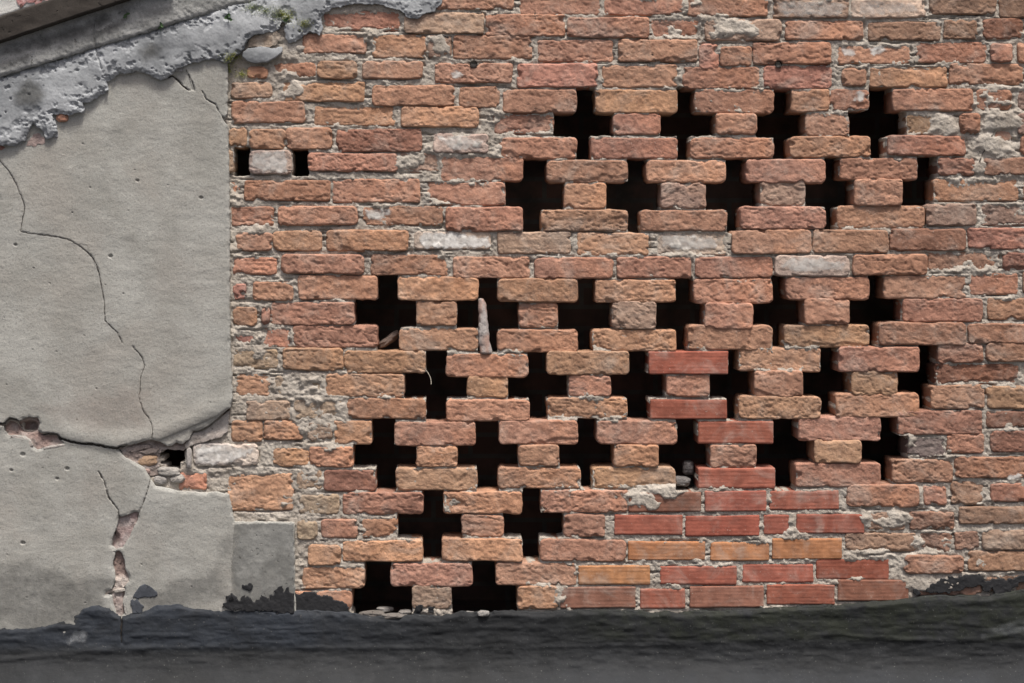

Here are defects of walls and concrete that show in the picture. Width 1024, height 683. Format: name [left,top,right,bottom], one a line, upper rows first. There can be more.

peeling [242,31,283,64]
crack [168,71,224,119]
spalling [18,113,79,147]
crack [0,161,153,434]
flaking render [5,417,64,450]
crack [0,418,127,449]
flaking render [120,410,230,485]
flaking render [105,512,158,616]